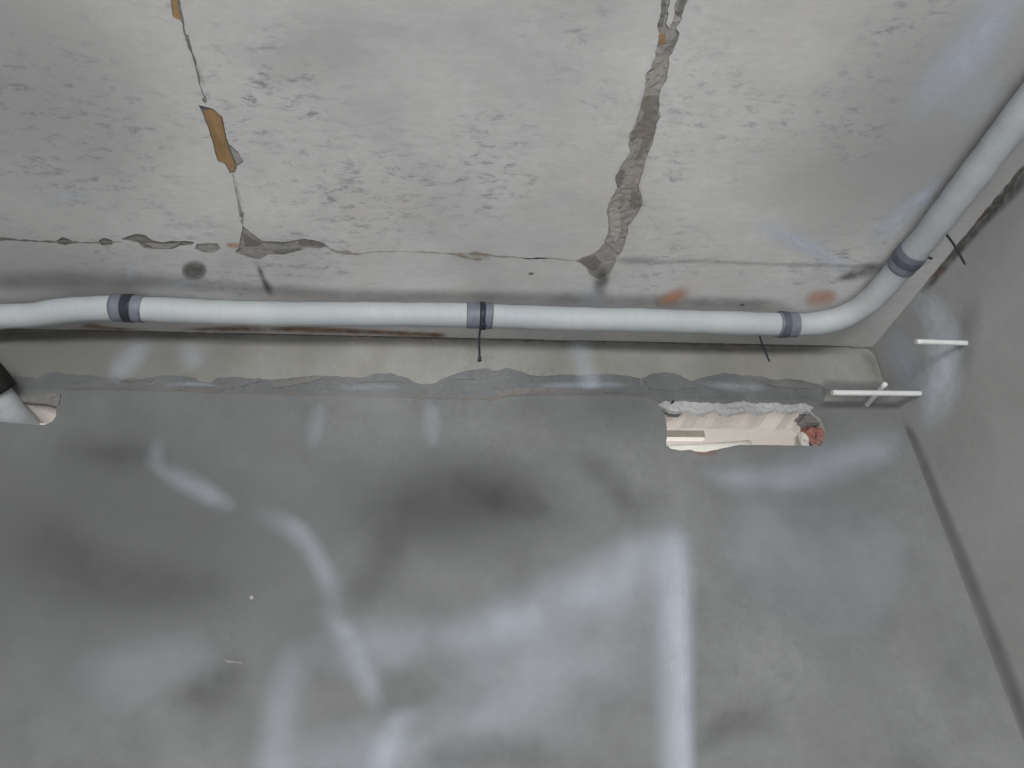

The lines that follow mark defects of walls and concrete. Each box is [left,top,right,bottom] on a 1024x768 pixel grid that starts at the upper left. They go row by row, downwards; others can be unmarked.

crack [182,22,204,96]
crack [232,173,244,226]
crack [0,236,120,244]
crack [327,247,579,261]
spalling [658,401,823,446]